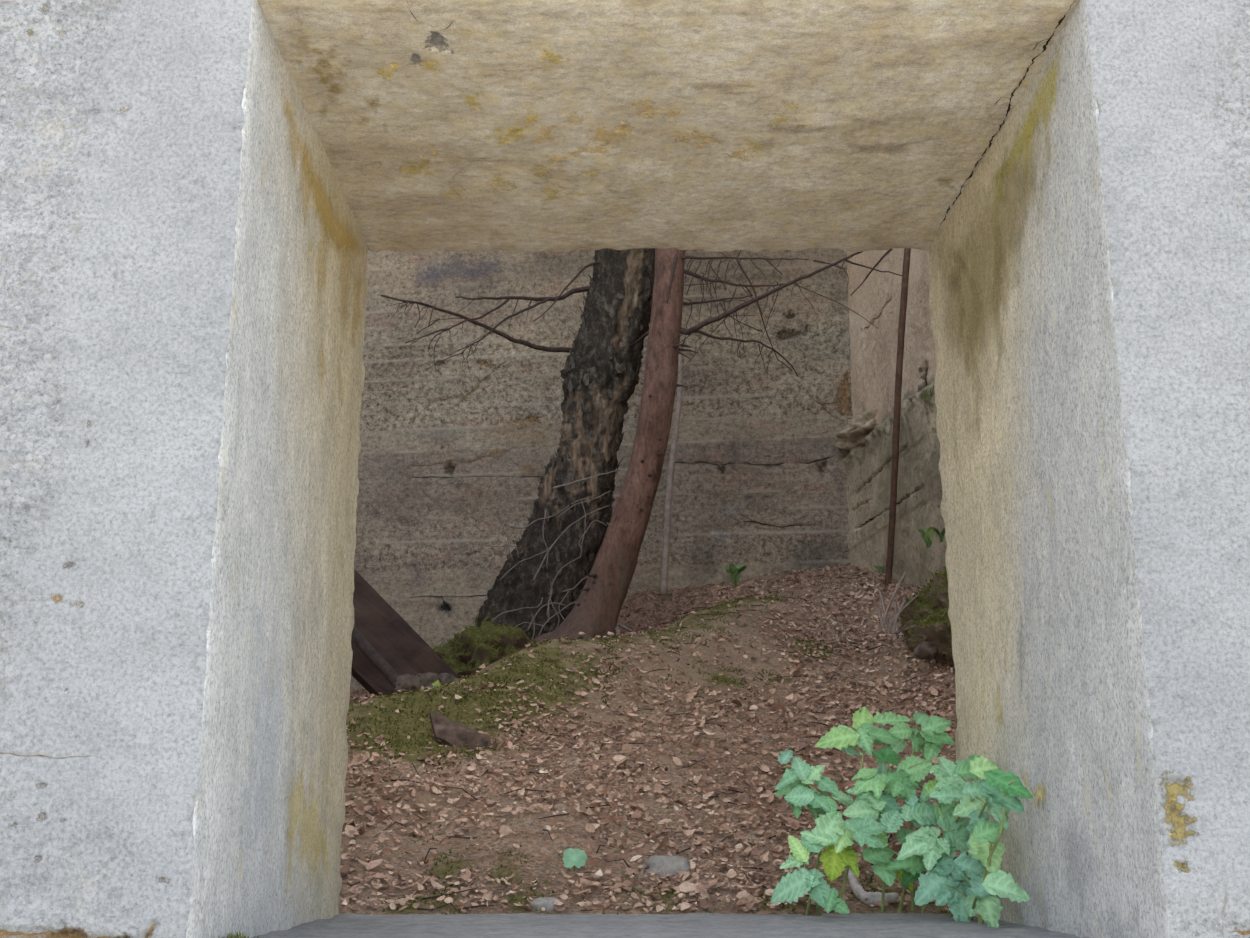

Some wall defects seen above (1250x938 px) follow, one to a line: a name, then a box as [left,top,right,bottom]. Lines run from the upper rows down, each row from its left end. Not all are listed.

crack [0,924,155,938]
crack [1201,840,1250,937]